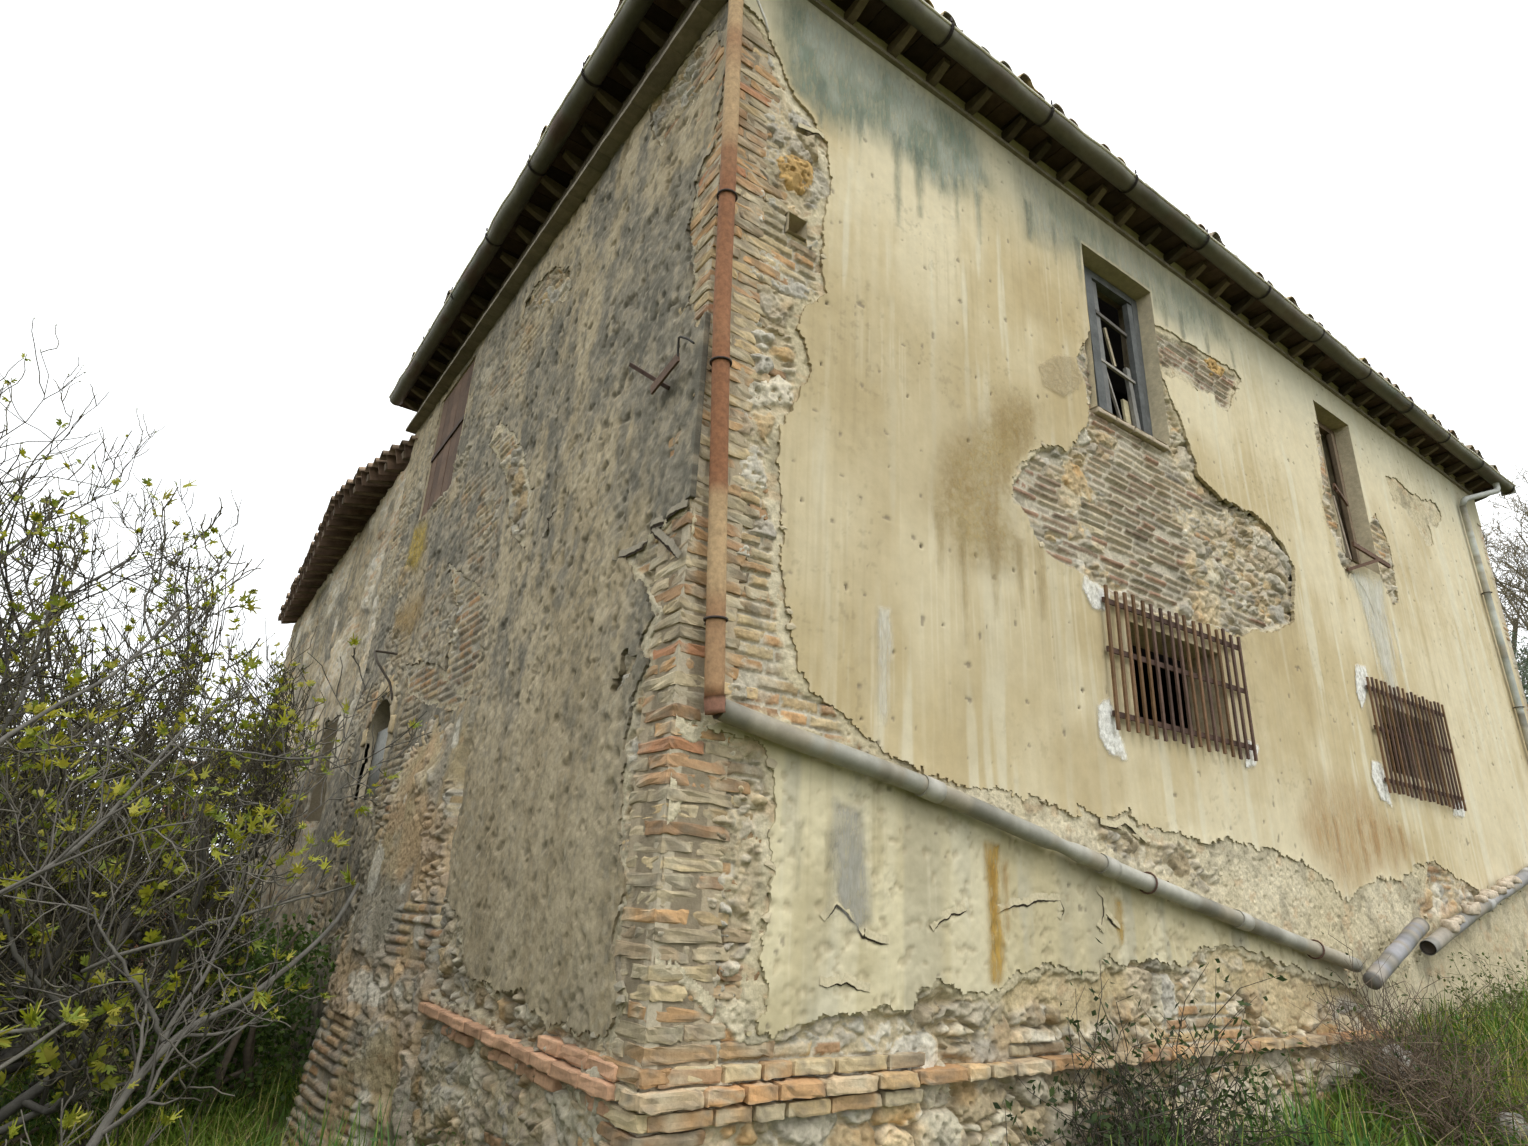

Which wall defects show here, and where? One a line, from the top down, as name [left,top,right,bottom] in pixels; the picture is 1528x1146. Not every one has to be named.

spalling [648,7,1528,1146]